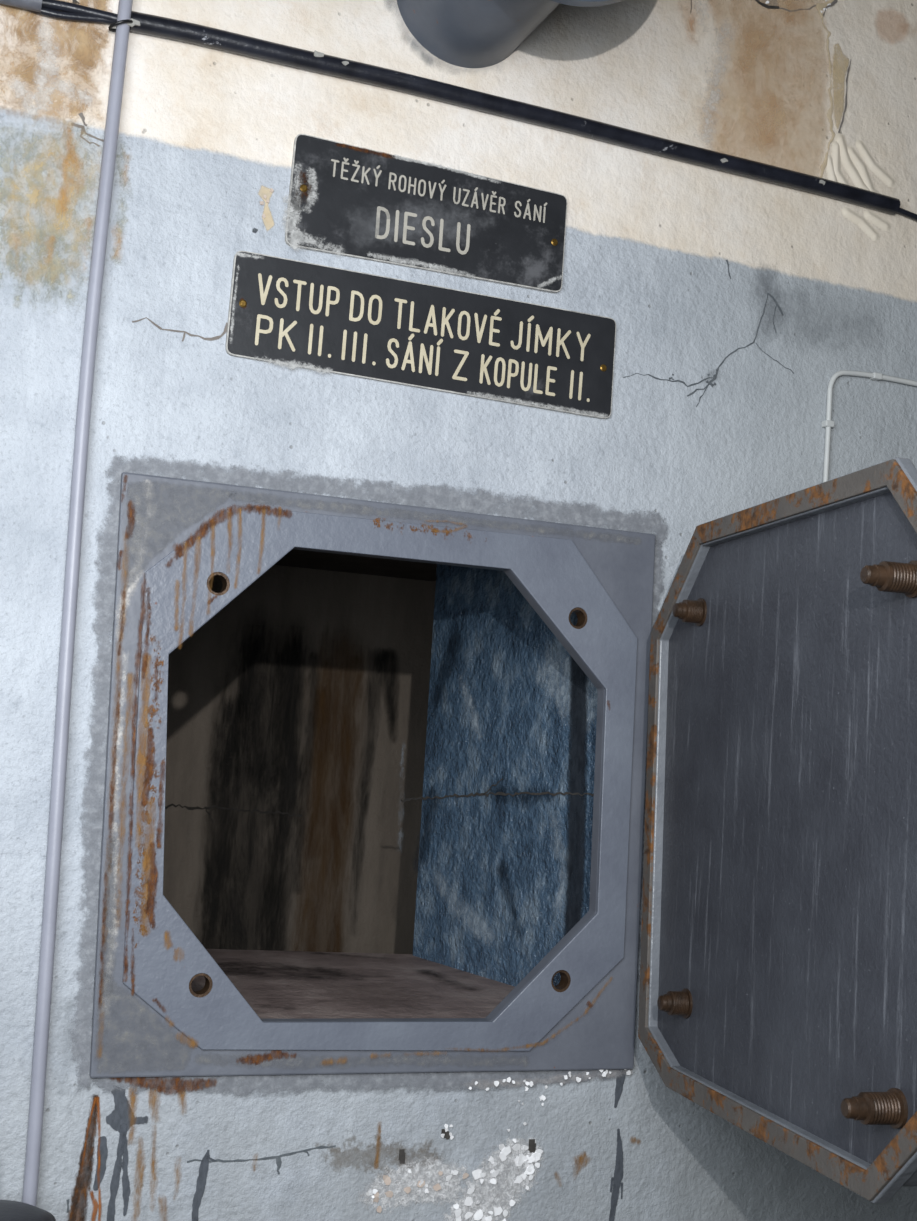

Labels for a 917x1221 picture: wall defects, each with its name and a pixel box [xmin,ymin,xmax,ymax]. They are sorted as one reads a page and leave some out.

damp [0,0,113,118]
crack [779,4,816,12]
flaking render [816,0,851,178]
damp [0,130,95,299]
crack [132,317,227,341]
crack [623,293,794,407]
rust [117,475,135,577]
rust [167,504,291,640]
rust [101,581,177,995]
spalling [468,1069,631,1106]
rust [68,1095,101,1221]
peeling [358,1122,543,1221]